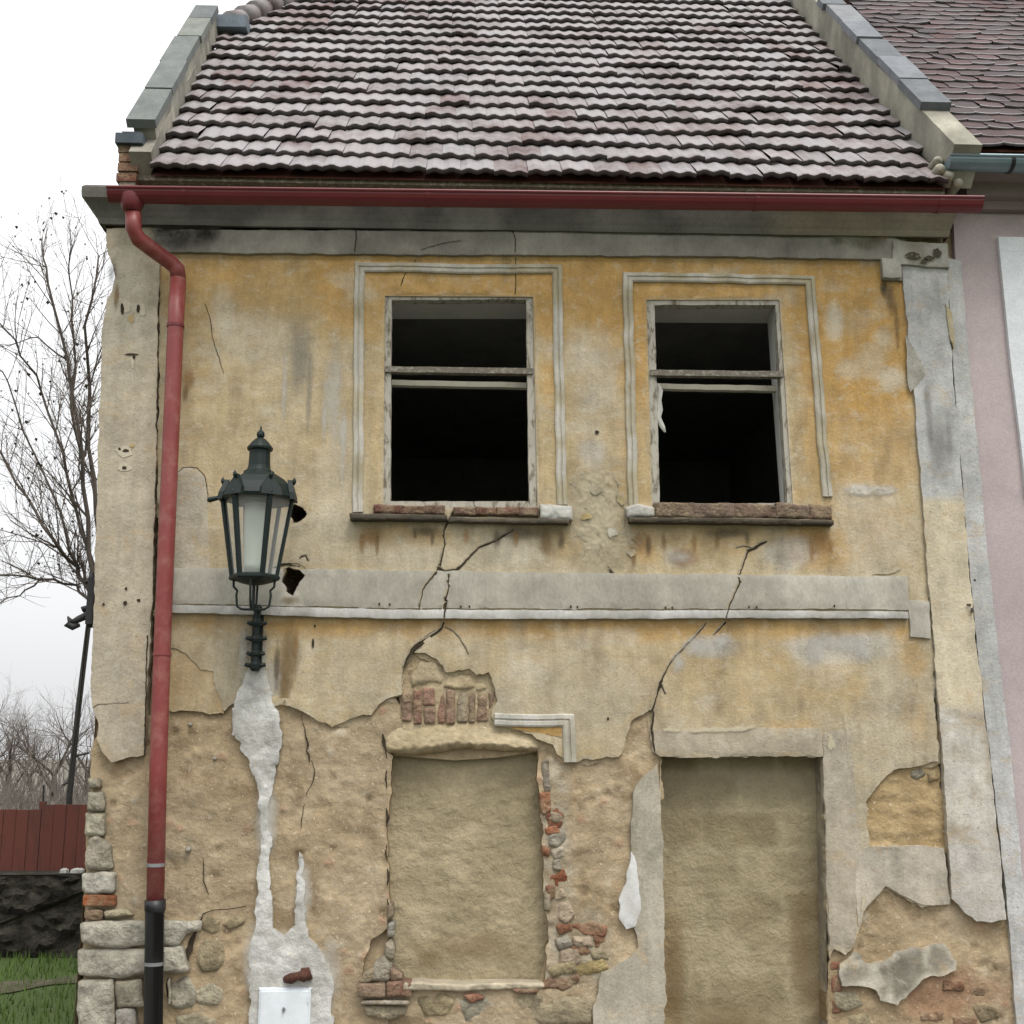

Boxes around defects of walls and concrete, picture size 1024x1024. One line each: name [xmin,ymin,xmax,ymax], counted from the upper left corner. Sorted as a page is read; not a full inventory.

flaking render [905,248,942,263]
flaking render [121,299,145,323]
peeling [906,336,925,392]
peeling [945,304,955,350]
flaking render [115,443,135,471]
crack [402,510,514,668]
crack [649,540,767,755]
spalling [77,715,151,1024]
crack [301,717,315,827]
spalling [163,649,664,1024]
spalling [866,765,946,853]
spalling [819,891,1014,1024]